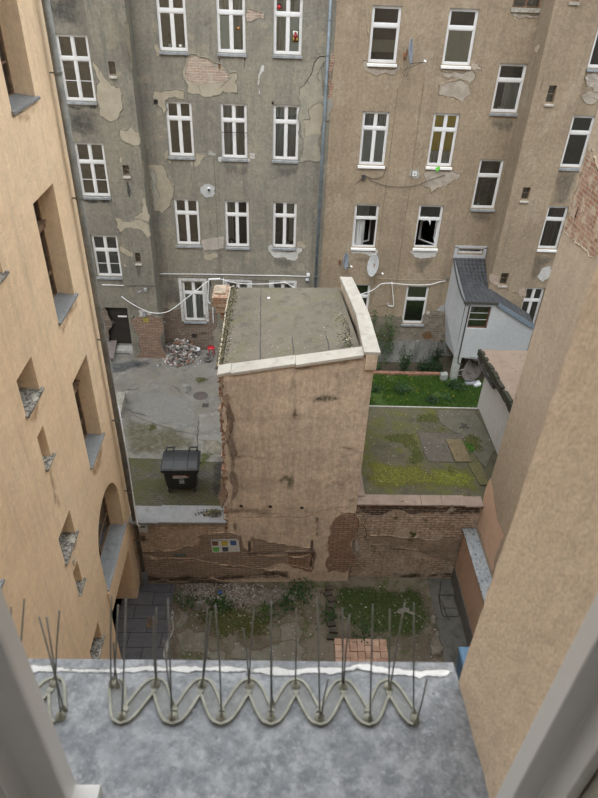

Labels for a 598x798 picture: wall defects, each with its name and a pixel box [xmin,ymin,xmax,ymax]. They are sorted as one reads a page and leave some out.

peeling [91,60,141,146]
peeling [152,53,239,116]
peeling [297,54,336,163]
peeling [437,61,482,103]
flaking render [580,72,598,105]
peeling [114,159,175,267]
peeling [409,168,462,195]
flaking render [564,143,598,260]
spalling [220,377,234,445]
flaking render [135,531,315,584]
flaking render [325,501,481,573]